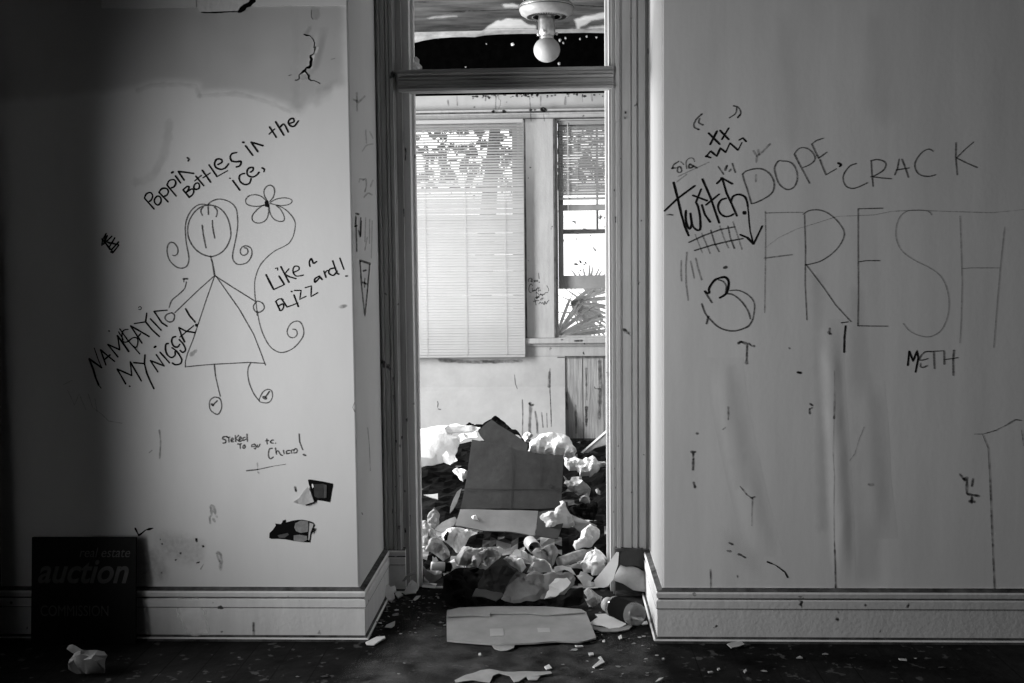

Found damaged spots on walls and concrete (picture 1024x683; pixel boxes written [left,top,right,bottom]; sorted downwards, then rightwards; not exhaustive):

crack [288,34,335,84]